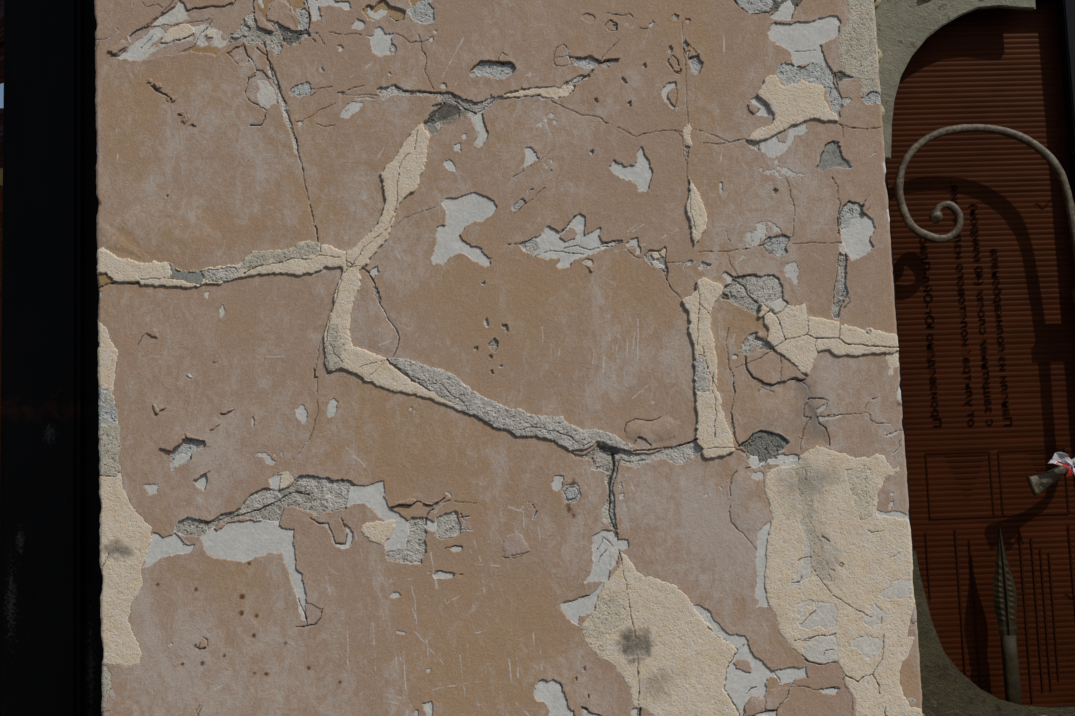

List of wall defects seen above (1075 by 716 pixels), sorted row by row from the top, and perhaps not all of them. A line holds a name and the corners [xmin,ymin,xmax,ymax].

peeling [107,0,437,127]
crack [303,0,360,45]
crack [552,26,739,181]
flaking render [733,0,881,195]
crack [96,44,661,453]
peeling [432,193,497,267]
peeling [508,214,668,279]
crack [788,178,841,244]
crack [629,230,774,459]
crack [757,303,901,454]
flaking render [98,292,474,716]
flaking render [560,430,922,716]